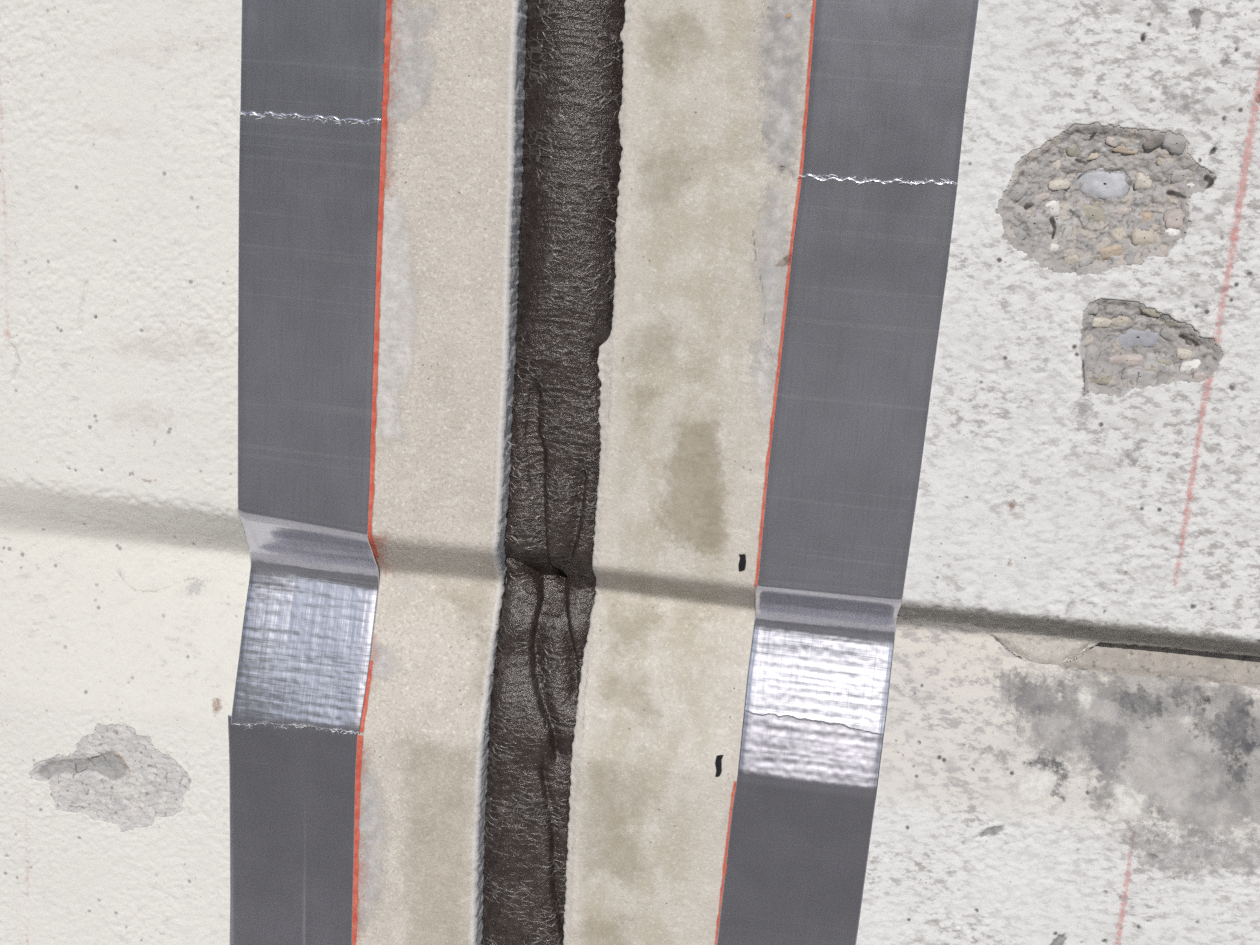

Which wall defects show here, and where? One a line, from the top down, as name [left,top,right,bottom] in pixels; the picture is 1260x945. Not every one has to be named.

spalling [995,122,1216,276]
spalling [1079,298,1223,397]
spalling [29,724,191,832]
water stain [1002,669,1260,878]